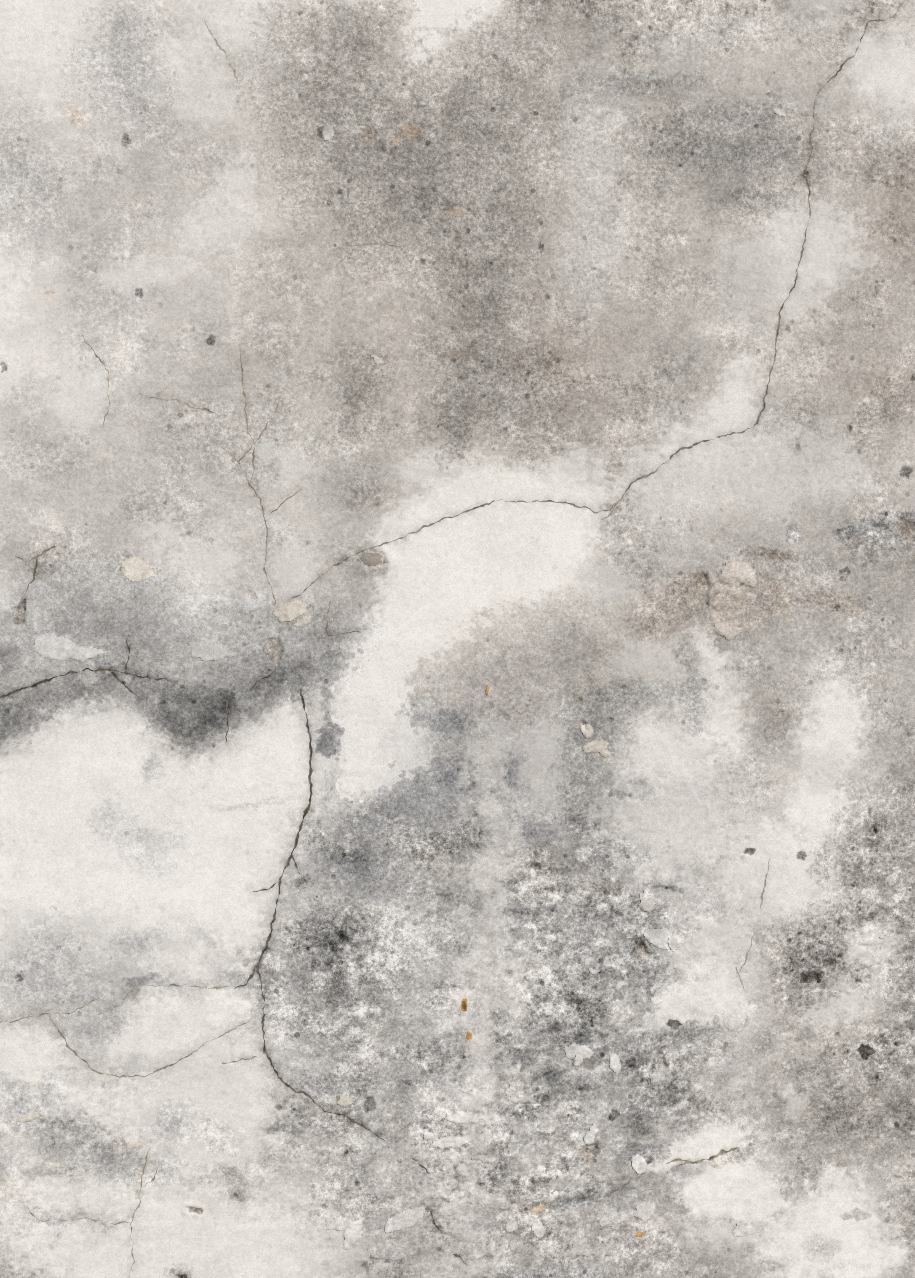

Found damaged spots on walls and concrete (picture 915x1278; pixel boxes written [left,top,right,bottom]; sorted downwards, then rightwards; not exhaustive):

water stain [229,0,815,479]
crack [139,2,904,639]
crack [82,335,110,427]
crack [16,546,56,619]
water stain [744,521,874,632]
crack [0,639,170,698]
crack [225,671,275,742]
crack [0,689,385,1141]
water stain [0,547,915,1278]
crack [736,859,770,991]
crack [430,1211,506,1278]